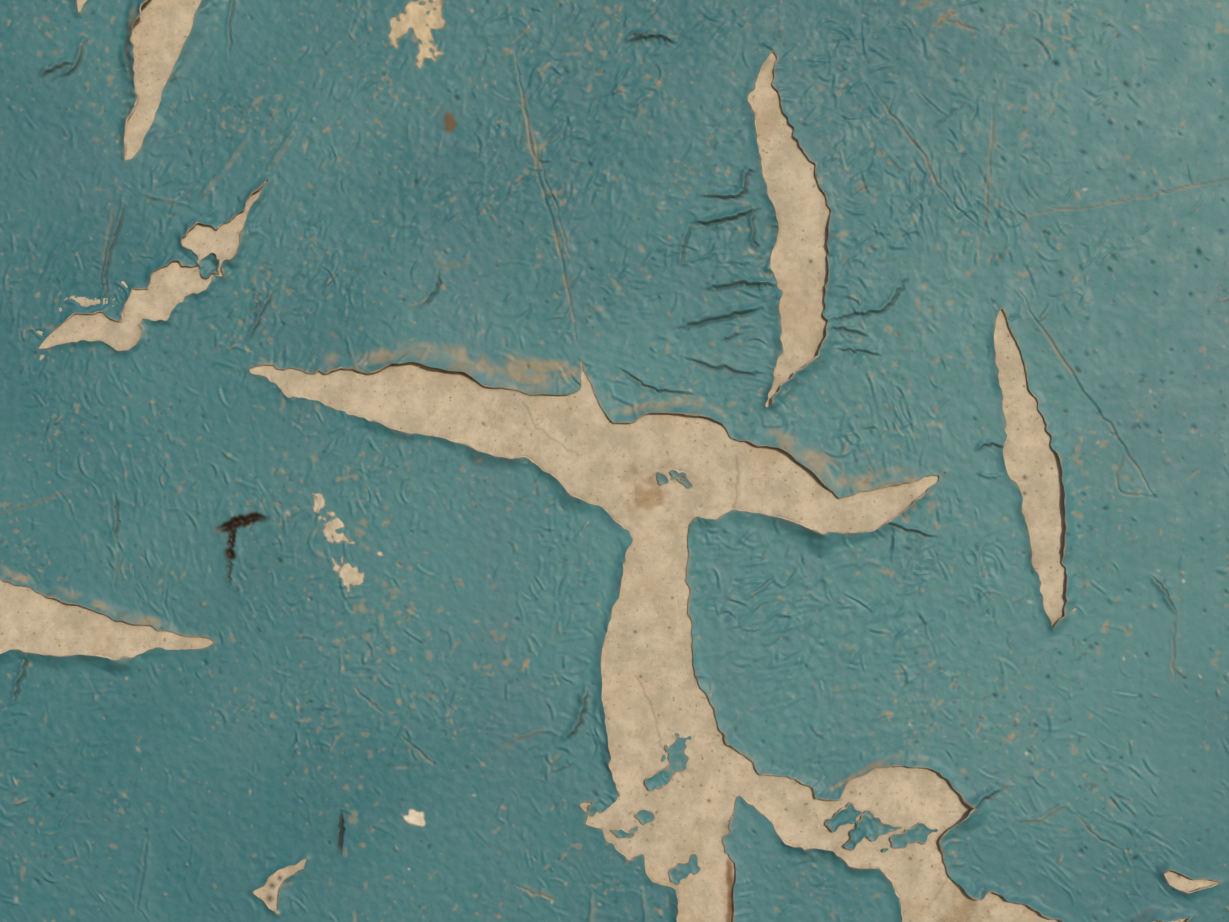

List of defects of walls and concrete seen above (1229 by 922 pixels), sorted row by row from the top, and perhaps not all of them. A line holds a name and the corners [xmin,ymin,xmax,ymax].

peeling [115,0,229,170]
peeling [32,170,280,363]
crack [614,163,771,400]
peeling [243,34,1083,922]
peeling [0,560,223,681]
peeling [1121,856,1229,922]